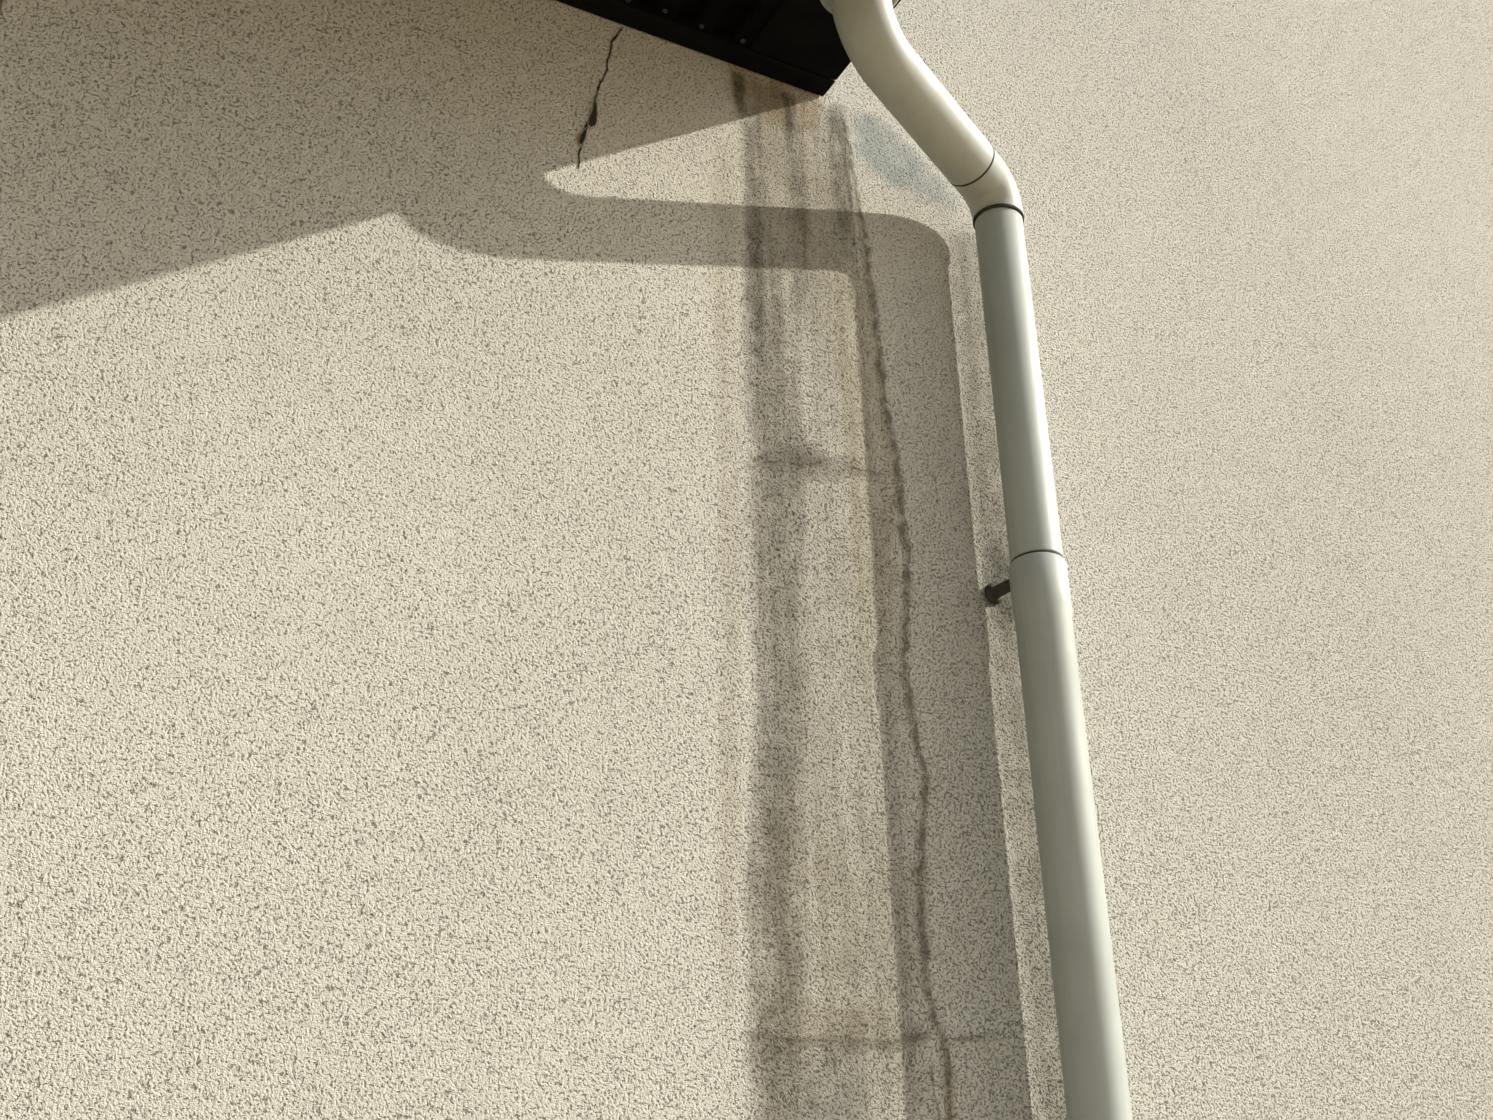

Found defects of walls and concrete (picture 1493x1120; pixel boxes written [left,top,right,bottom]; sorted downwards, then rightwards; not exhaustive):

crack [578,28,622,170]
crack [843,123,951,1120]